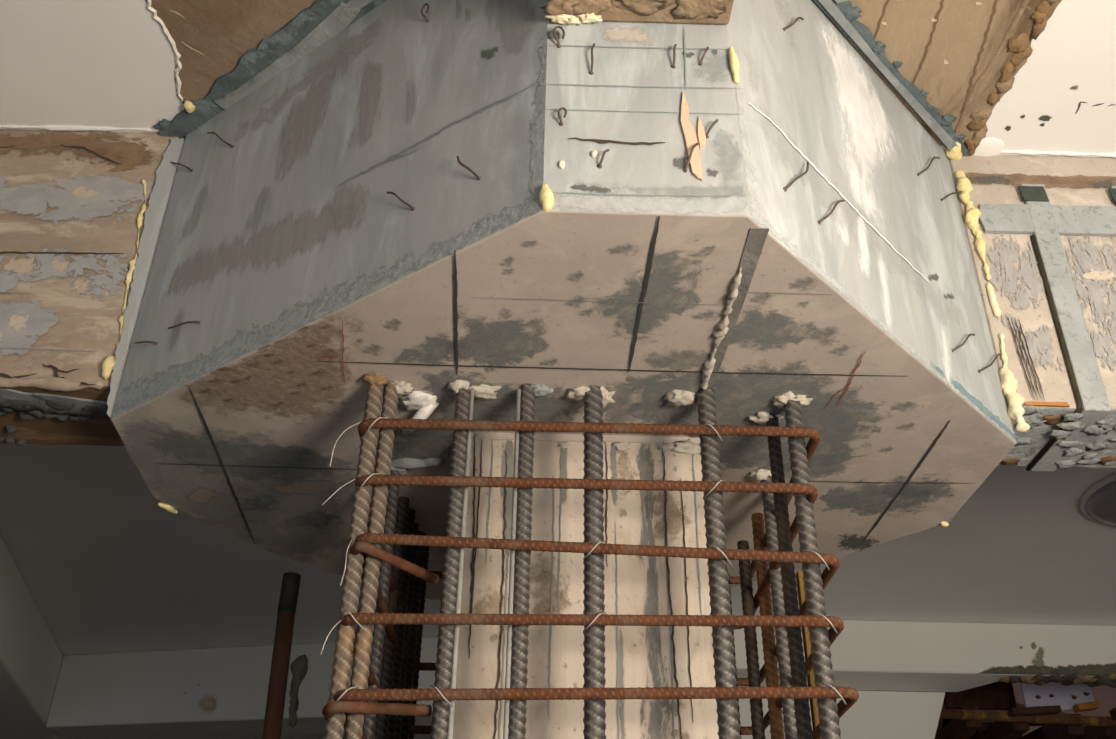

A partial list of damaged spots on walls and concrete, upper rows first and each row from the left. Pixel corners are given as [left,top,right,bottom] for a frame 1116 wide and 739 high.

flaking render [145,0,315,106]
flaking render [812,0,947,149]
flaking render [849,0,1062,156]
peeling [0,131,155,227]
leakage [821,25,894,327]
peeling [0,247,129,369]
leakage [391,312,556,461]
leakage [569,246,714,340]
leakage [605,351,880,477]
leakage [729,294,834,350]
leakage [125,422,347,559]
leakage [611,444,688,739]